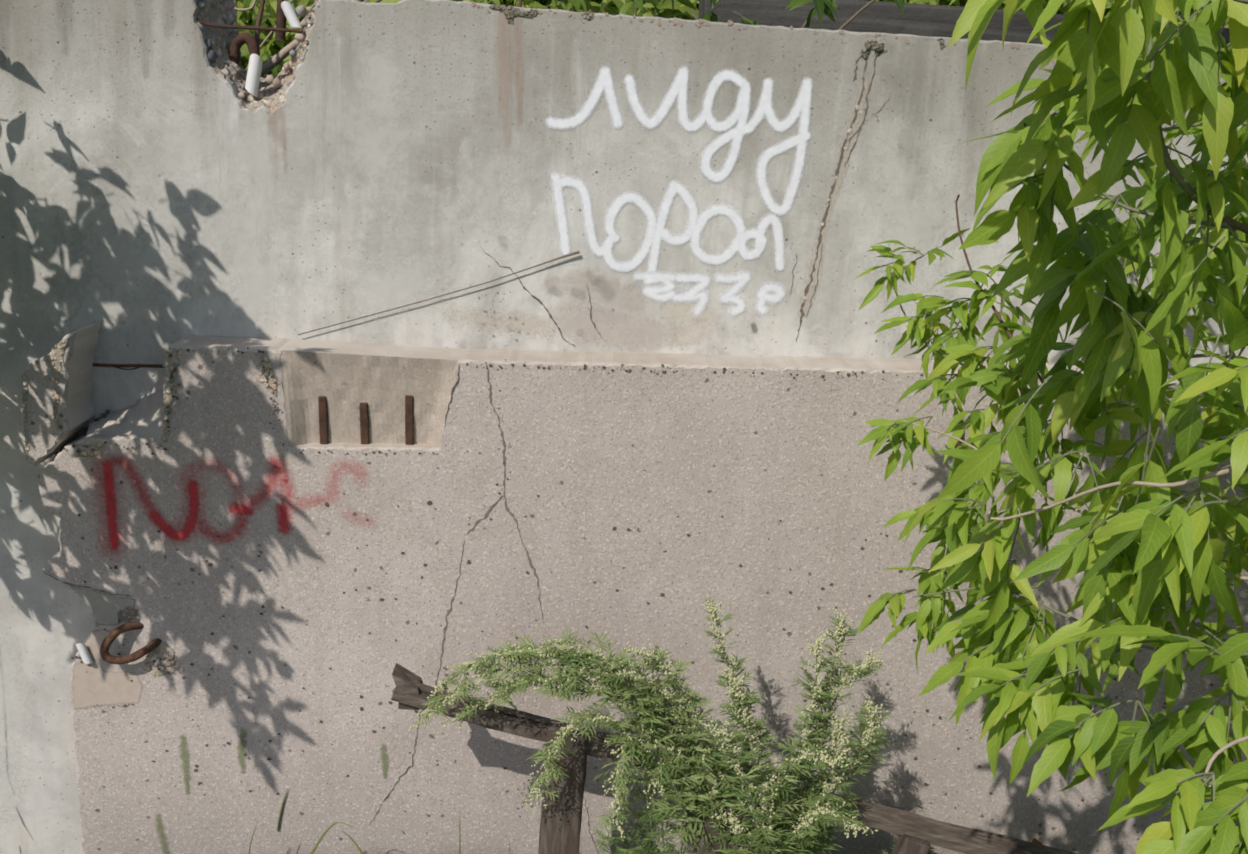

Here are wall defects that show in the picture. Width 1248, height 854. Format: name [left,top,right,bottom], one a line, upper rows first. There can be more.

spalling [197,0,320,112]
crack [790,49,890,342]
crack [480,246,604,348]
spalling [45,338,70,431]
spalling [63,347,284,458]
crack [435,362,543,686]
peeling [42,571,194,709]
crack [370,712,421,823]